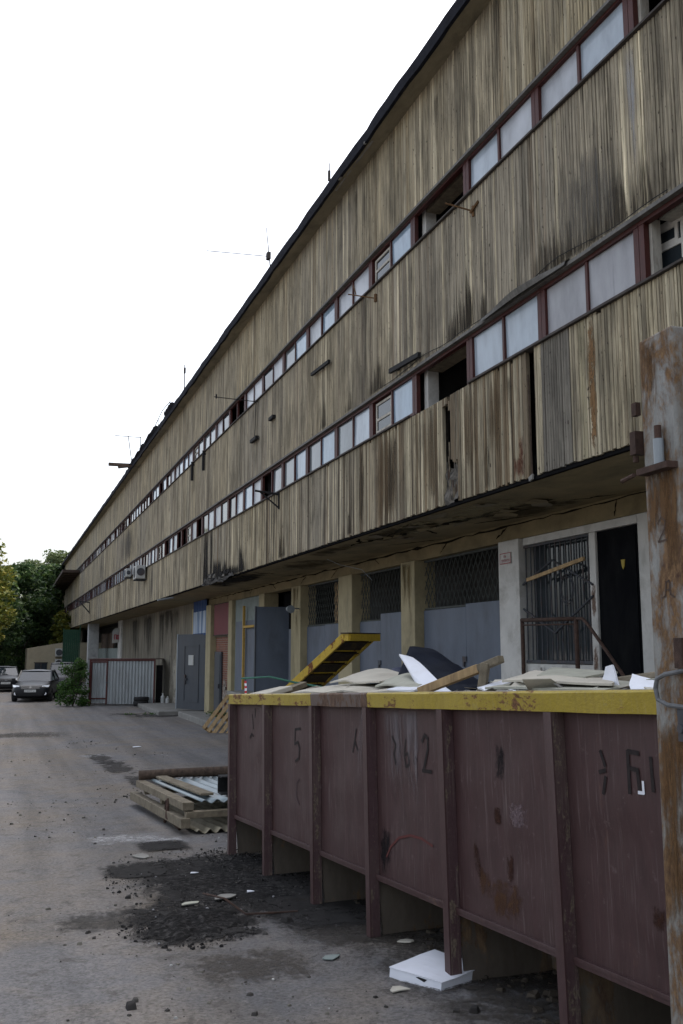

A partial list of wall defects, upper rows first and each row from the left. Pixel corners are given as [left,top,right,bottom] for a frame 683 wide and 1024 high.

leakage [447,289,486,342]
corrosion [588,323,597,445]
leakage [203,531,244,583]
crack [209,491,646,600]
corrosion [648,469,677,566]